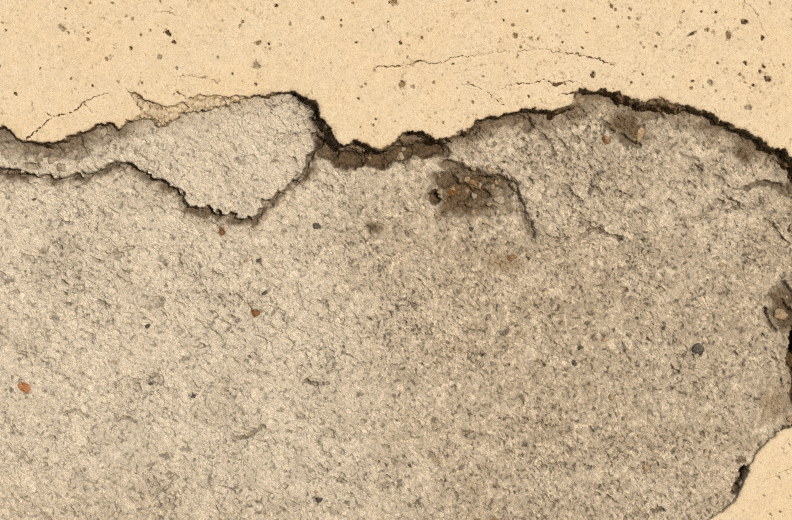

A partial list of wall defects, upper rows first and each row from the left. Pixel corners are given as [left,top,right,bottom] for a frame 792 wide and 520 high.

crack [23,90,155,141]
spalling [0,91,334,220]
crack [173,74,218,99]
crack [372,48,615,69]
spalling [373,88,792,179]
spalling [446,93,792,246]
spalling [0,117,792,520]